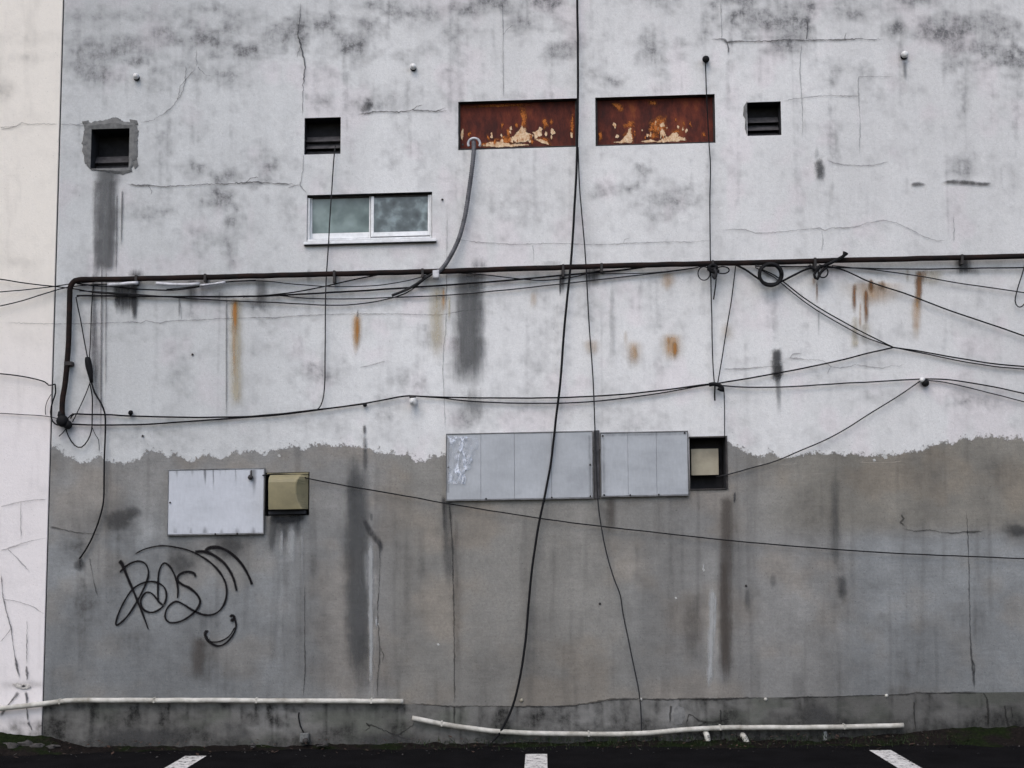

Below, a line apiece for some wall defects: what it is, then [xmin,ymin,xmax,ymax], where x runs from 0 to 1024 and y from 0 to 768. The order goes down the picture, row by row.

crack [297,7,306,110]
crack [131,177,295,193]
water stain [92,170,123,393]
water stain [457,273,482,372]
water stain [772,350,782,379]
corrosion [853,280,884,320]
corrosion [915,271,924,311]
water stain [348,476,382,673]
flaking render [44,434,1024,707]
water stain [708,493,735,680]
crack [786,515,1013,727]